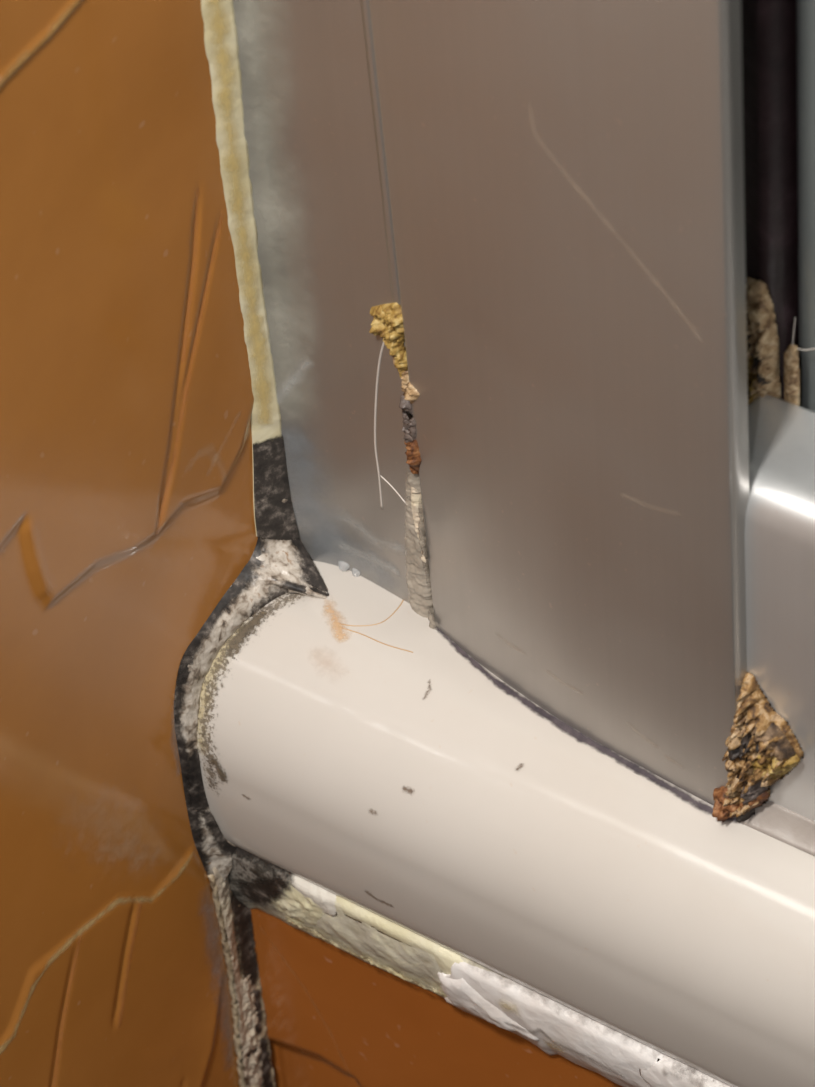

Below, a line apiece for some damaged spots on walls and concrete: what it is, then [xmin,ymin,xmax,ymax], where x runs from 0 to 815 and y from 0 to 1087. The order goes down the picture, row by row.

leakage [212,0,269,423]
crack [0,866,185,1053]
leakage [174,436,329,1087]
corrosion [712,672,804,823]